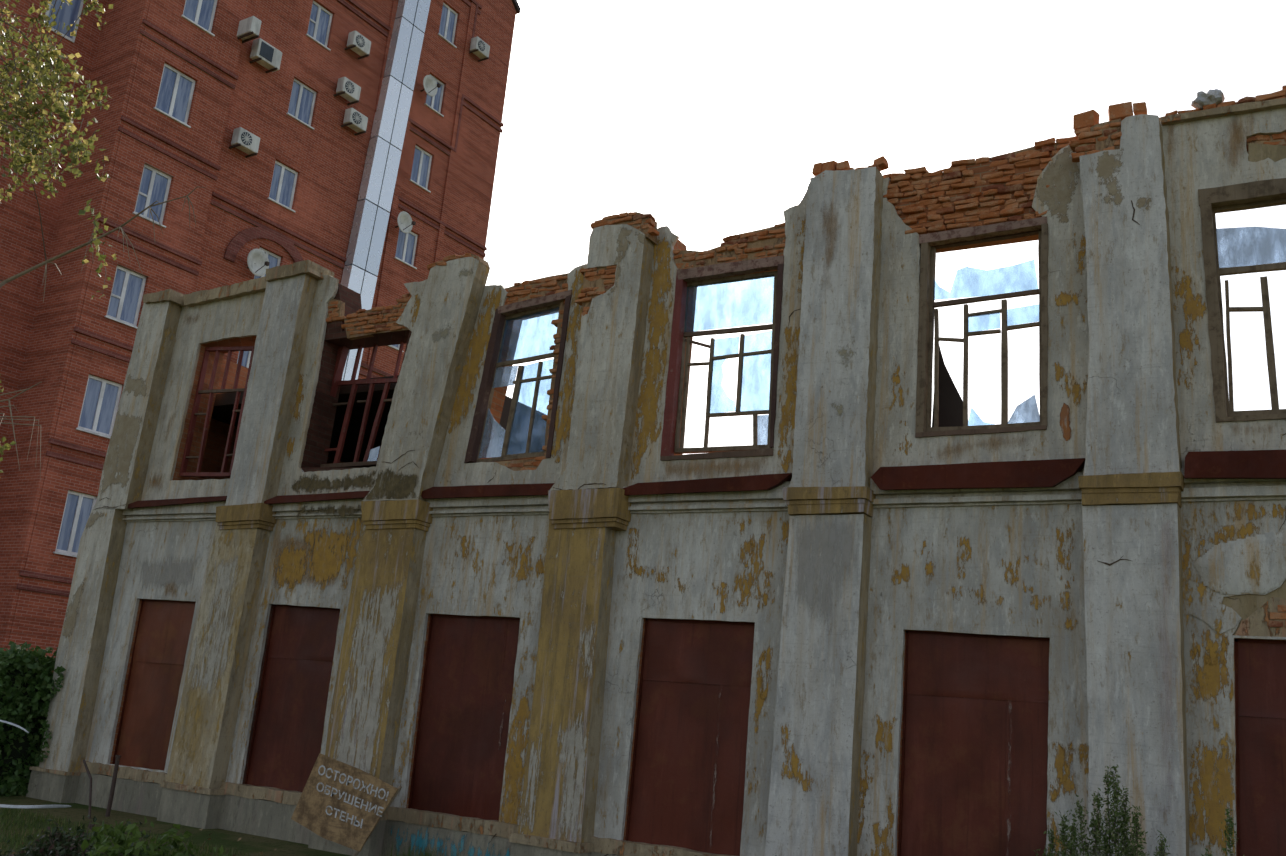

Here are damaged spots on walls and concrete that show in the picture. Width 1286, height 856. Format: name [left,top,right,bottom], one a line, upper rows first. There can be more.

peeling [1247,132,1286,162]
spalling [846,119,1151,306]
peeling [1171,267,1206,389]
peeling [1054,362,1088,441]
peeling [273,517,363,590]
peeling [626,528,690,593]
peeling [714,517,789,613]
peeling [1182,502,1286,586]
spalling [1190,581,1286,704]
peeling [781,724,813,792]
peeling [1048,742,1089,856]
peeling [1189,741,1235,856]